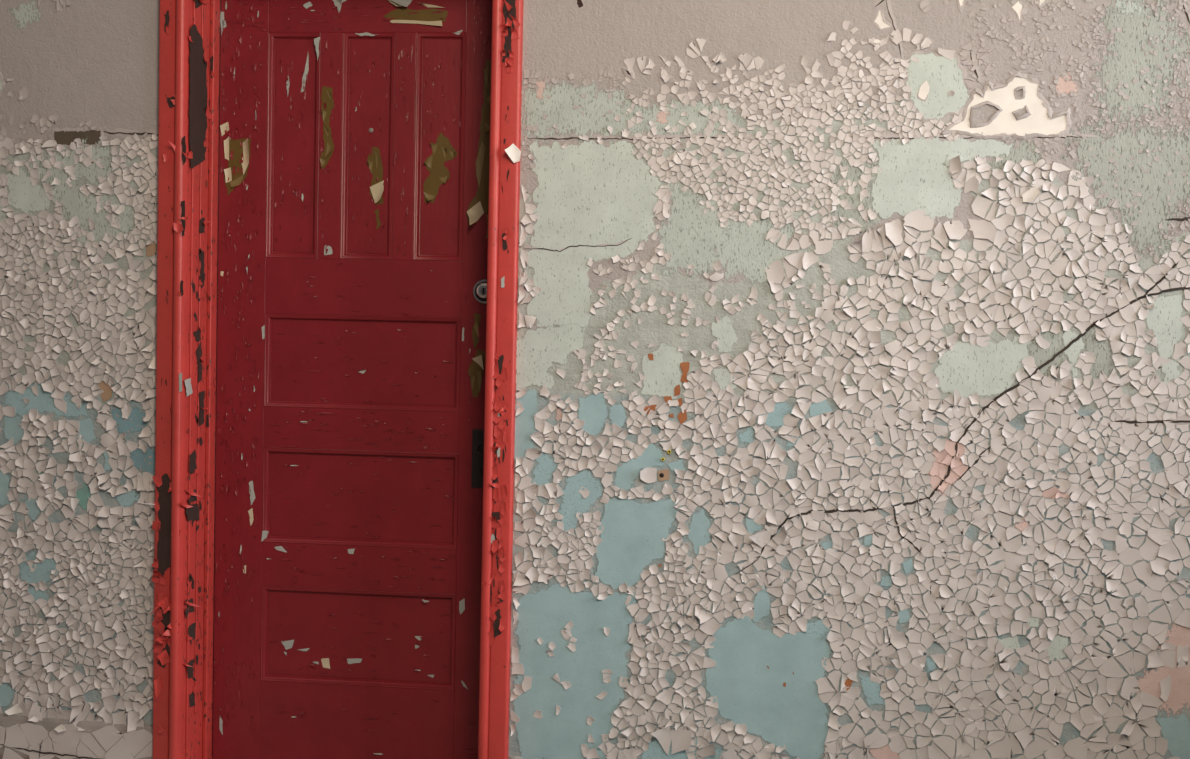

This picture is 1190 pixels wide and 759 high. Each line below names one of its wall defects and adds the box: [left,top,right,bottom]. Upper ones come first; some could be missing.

peeling [384,0,447,26]
peeling [286,37,320,95]
peeling [320,86,334,170]
peeling [367,147,384,229]
peeling [423,132,457,203]
crack [1165,215,1190,223]
peeling [0,24,251,759]
crack [736,261,1190,574]
peeling [248,481,287,559]
peeling [281,640,330,669]